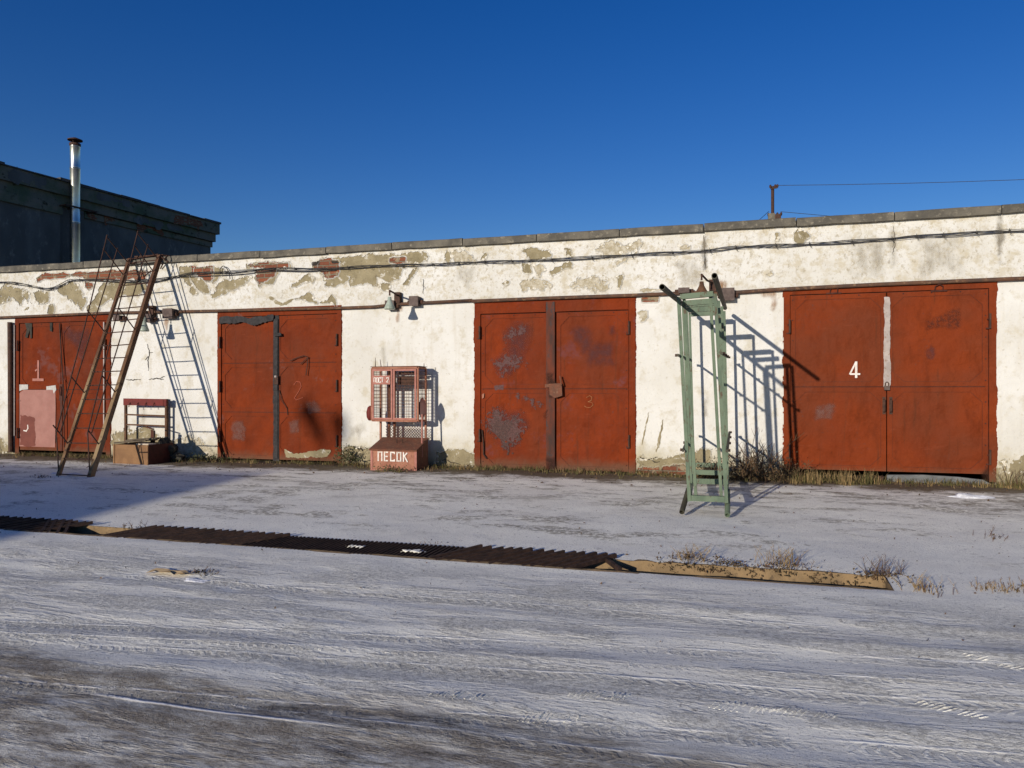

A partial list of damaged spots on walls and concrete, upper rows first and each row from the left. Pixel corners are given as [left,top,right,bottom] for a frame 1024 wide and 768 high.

flaking render [0,268,148,314]
peeling [179,250,430,306]
peeling [444,248,489,265]
peeling [501,238,644,294]
flaking render [636,287,661,323]
peeling [481,324,545,455]
peeling [284,444,370,465]